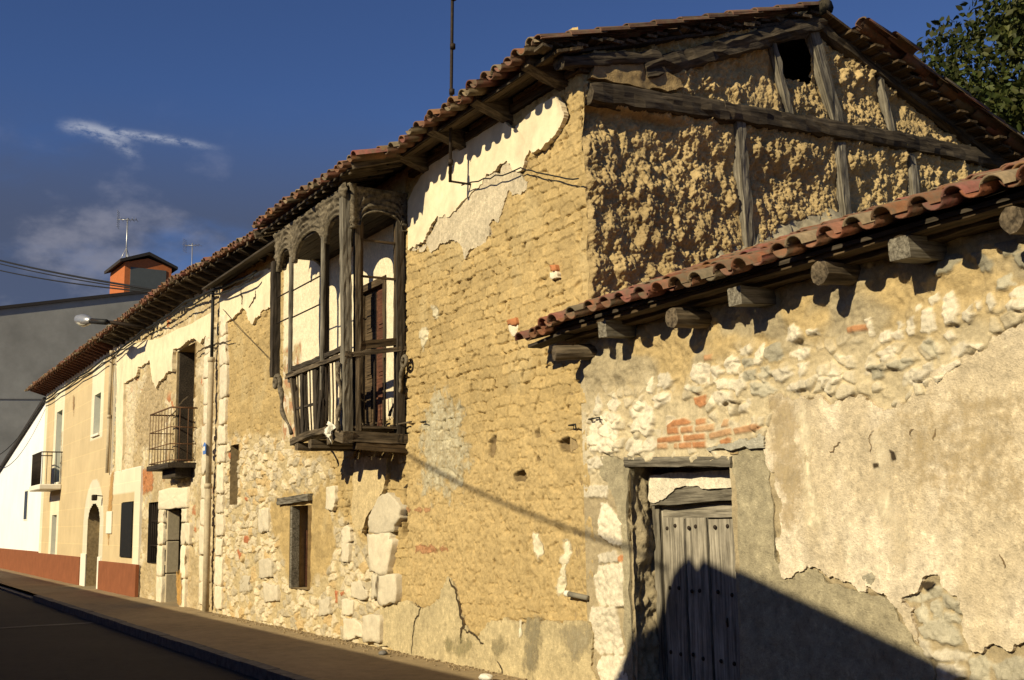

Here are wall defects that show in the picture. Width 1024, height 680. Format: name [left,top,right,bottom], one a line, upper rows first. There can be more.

peeling [408,96,568,260]
peeling [113,268,271,471]
peeling [732,322,1024,680]
crack [449,579,503,673]